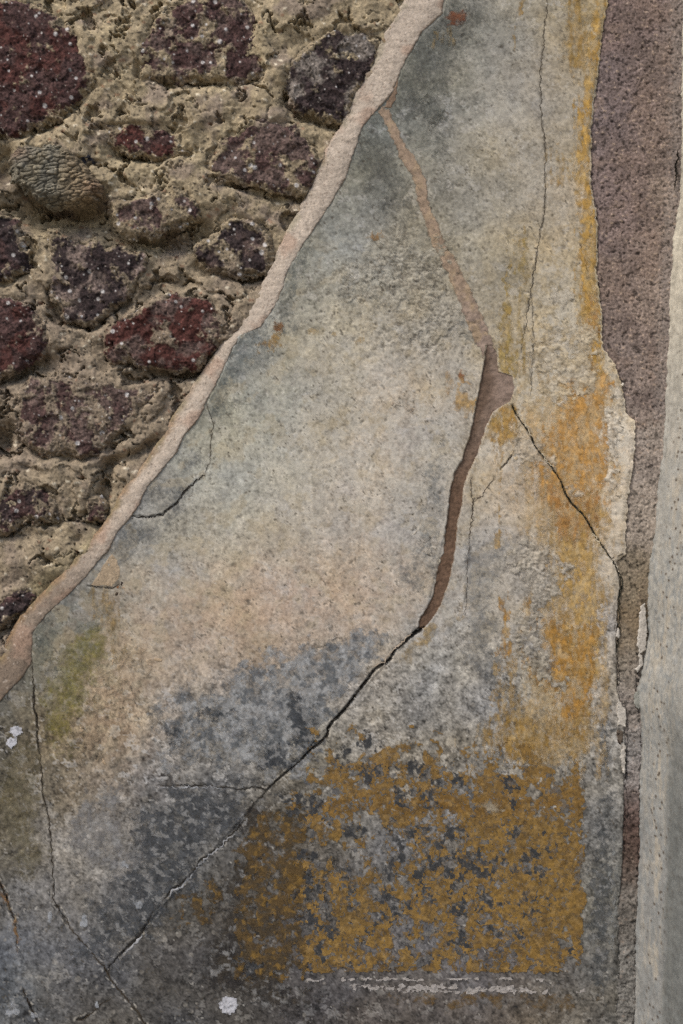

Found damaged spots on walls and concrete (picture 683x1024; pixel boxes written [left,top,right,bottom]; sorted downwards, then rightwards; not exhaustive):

crack [521,0,548,395]
crack [31,106,640,1024]
crack [0,884,19,949]